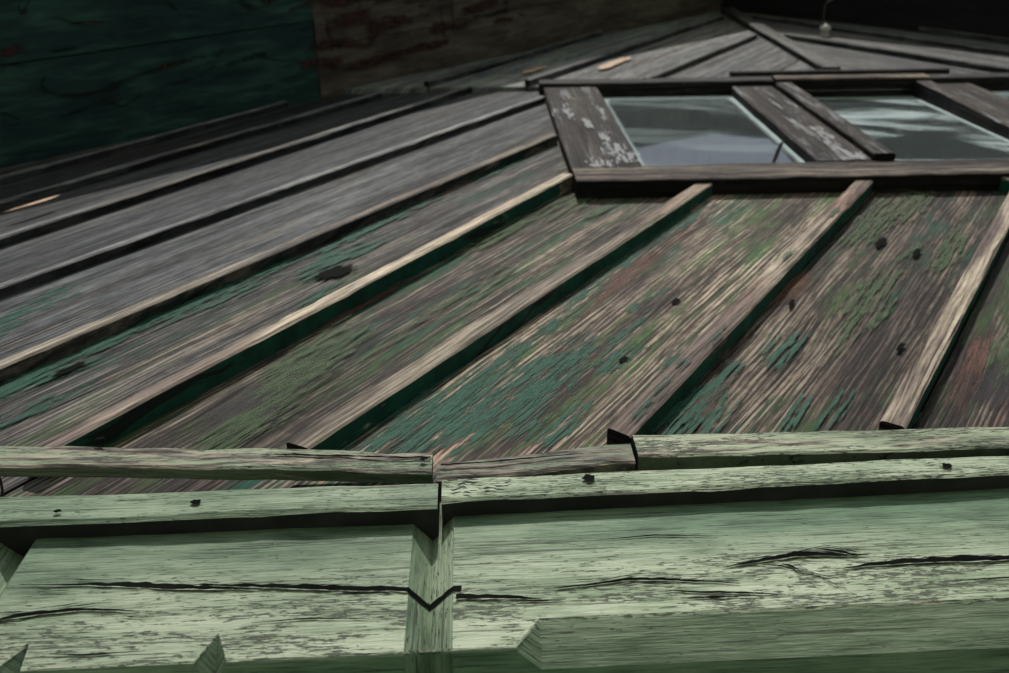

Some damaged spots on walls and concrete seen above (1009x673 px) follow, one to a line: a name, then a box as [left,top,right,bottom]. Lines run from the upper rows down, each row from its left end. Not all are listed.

peeling [560,90,639,167]
peeling [190,262,517,450]
peeling [336,191,726,462]
crack [252,616,370,624]
crack [0,544,1009,621]